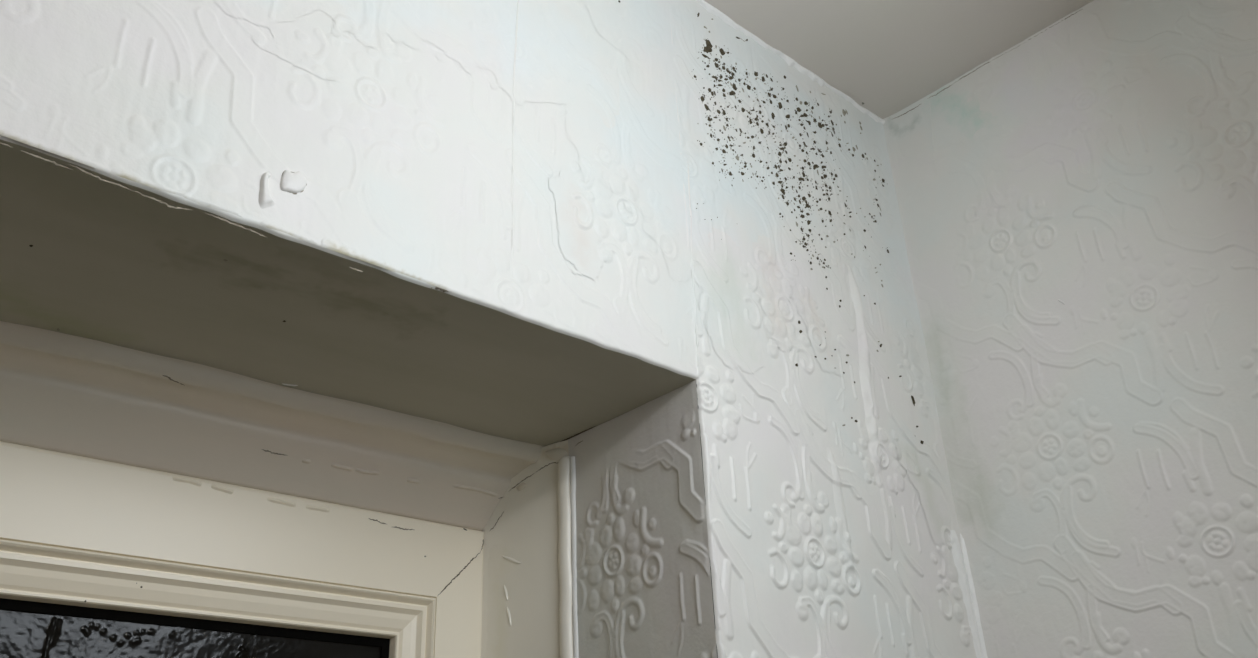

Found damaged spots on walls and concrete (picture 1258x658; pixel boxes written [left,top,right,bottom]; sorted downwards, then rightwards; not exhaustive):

leakage [191,0,1134,548]